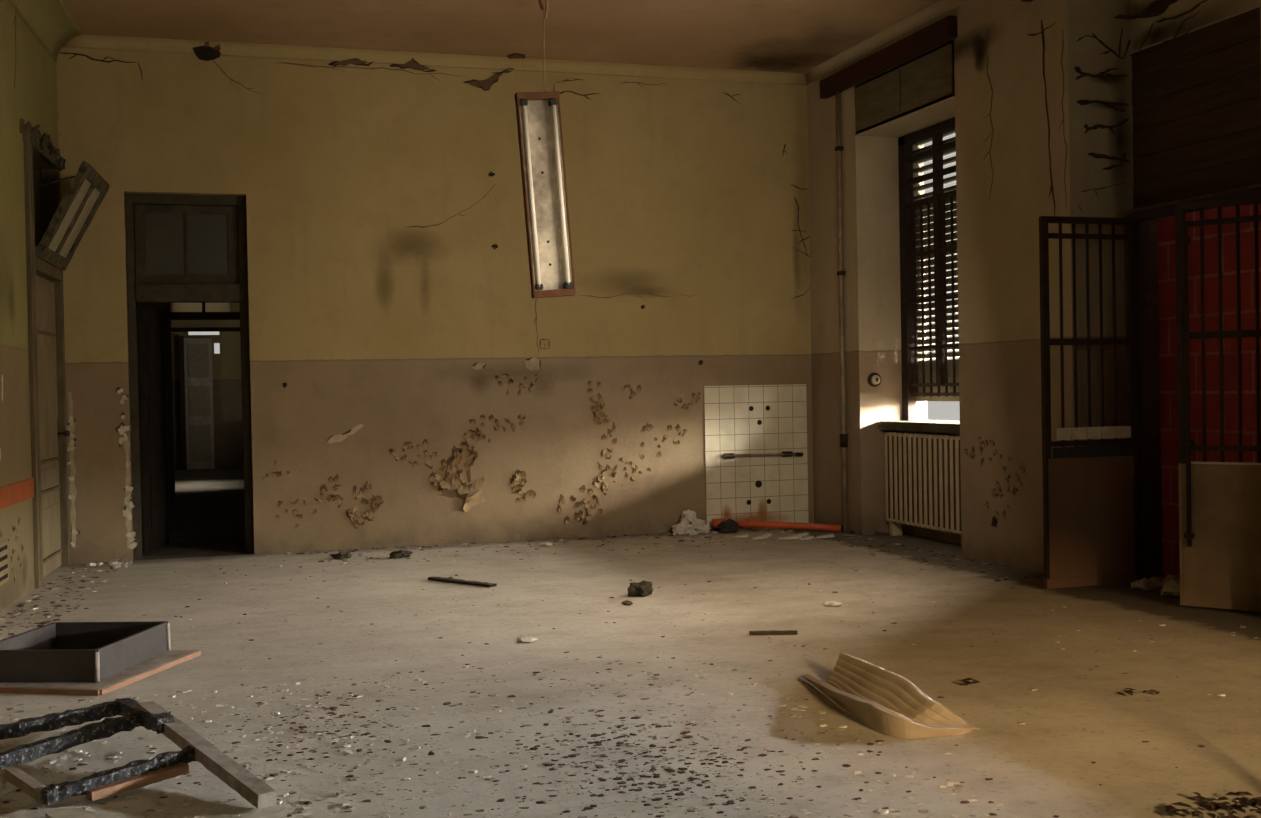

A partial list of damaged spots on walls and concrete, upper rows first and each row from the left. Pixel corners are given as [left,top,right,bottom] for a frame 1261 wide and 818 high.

crack [59,52,143,82]
flaking render [328,58,374,66]
flaking render [390,57,437,72]
flaking render [463,53,525,91]
crack [1027,12,1199,216]
peeling [67,392,80,548]
peeling [116,387,140,549]
peeling [389,412,525,512]
peeling [510,469,536,505]
peeling [556,381,687,525]